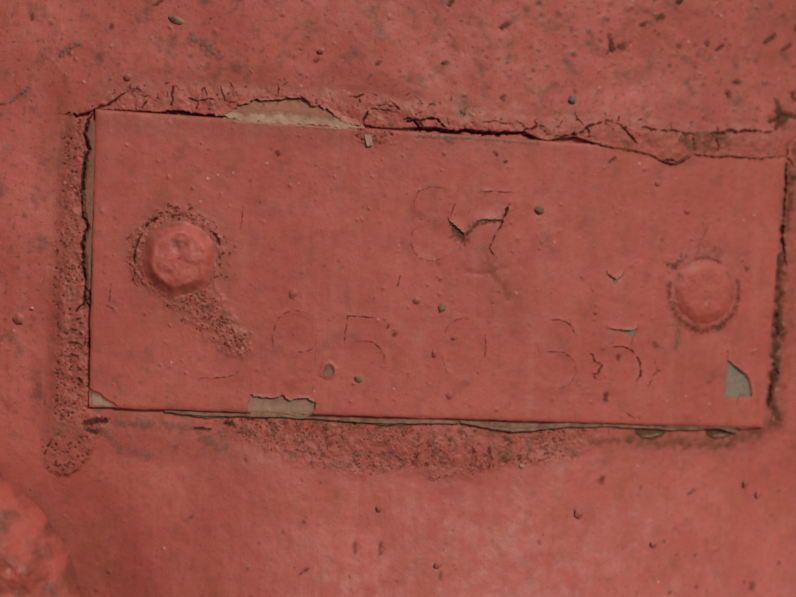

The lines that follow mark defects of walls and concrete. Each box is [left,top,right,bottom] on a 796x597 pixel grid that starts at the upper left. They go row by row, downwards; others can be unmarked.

peeling [214,94,374,146]
crack [331,94,793,266]
crack [56,82,236,385]
peeling [724,354,752,399]
crack [768,363,779,408]
peeling [164,393,753,439]